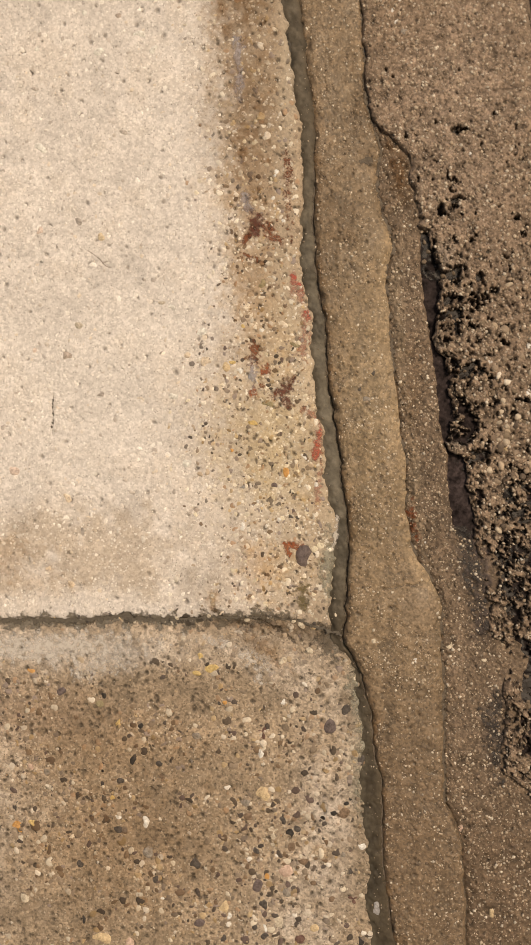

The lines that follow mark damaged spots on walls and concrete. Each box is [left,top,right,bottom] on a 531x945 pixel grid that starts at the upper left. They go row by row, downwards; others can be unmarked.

spalling [420,232,466,283]
spalling [443,295,463,337]
rust [244,339,295,409]
spalling [452,362,484,383]
crack [359,0,469,945]
crack [0,117,396,944]
rust [282,541,304,557]
spalling [494,470,531,616]